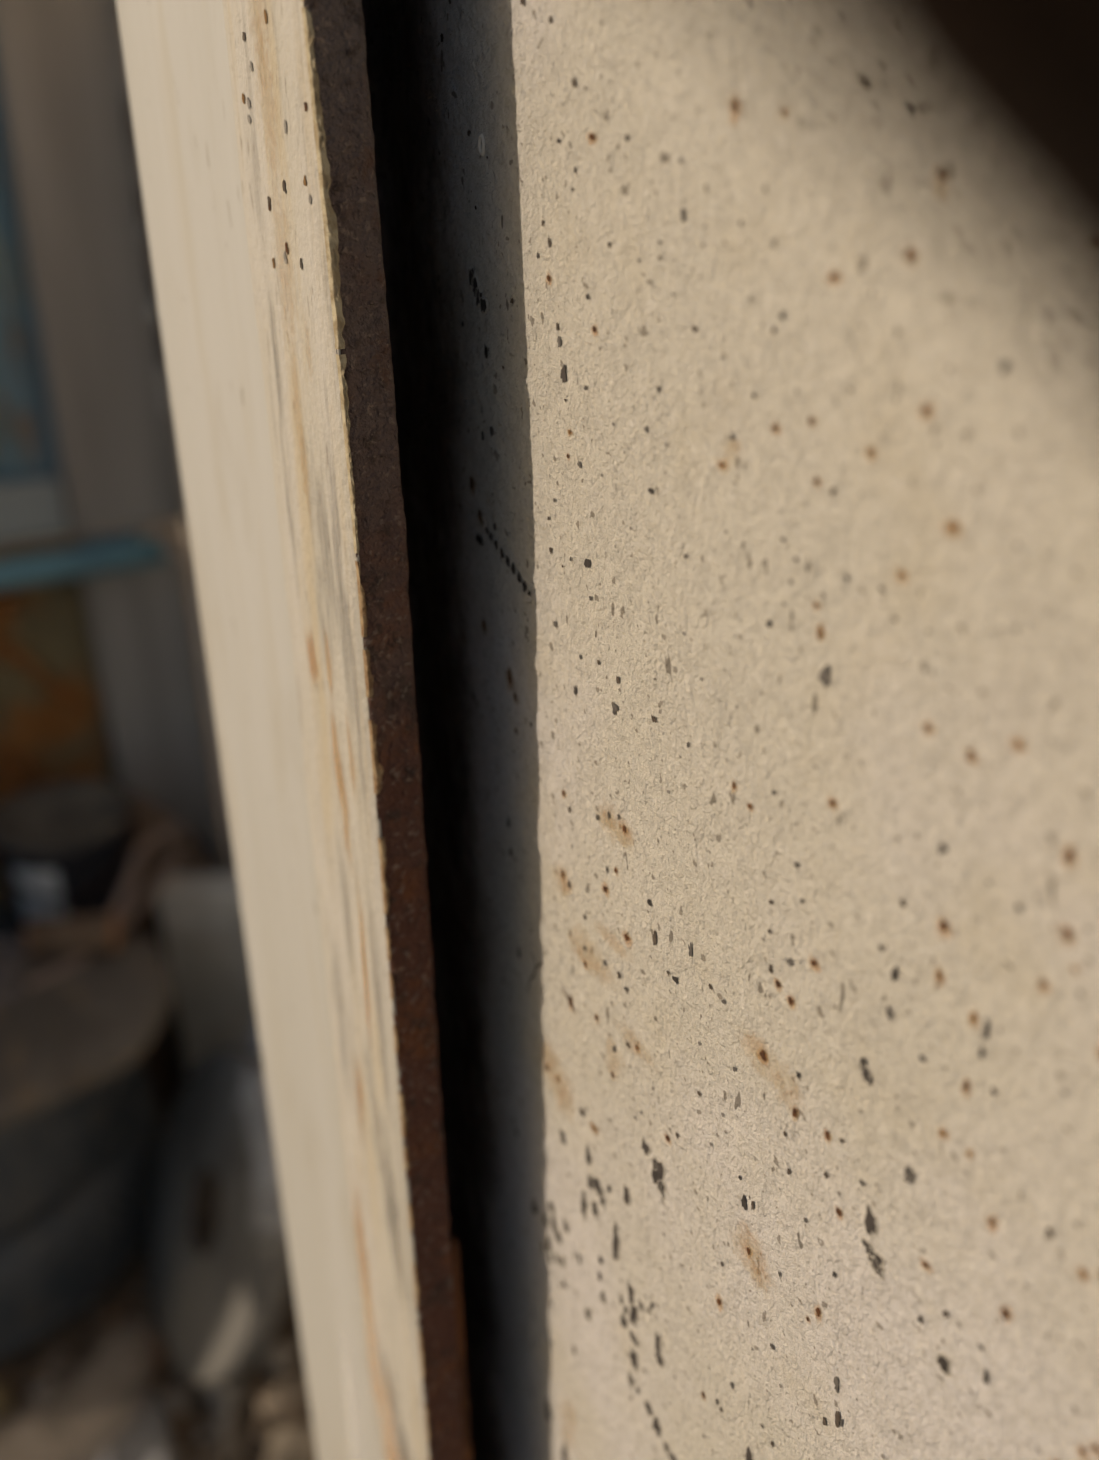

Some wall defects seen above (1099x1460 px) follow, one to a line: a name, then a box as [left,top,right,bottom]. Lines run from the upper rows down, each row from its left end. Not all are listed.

rust [369,0,500,1460]